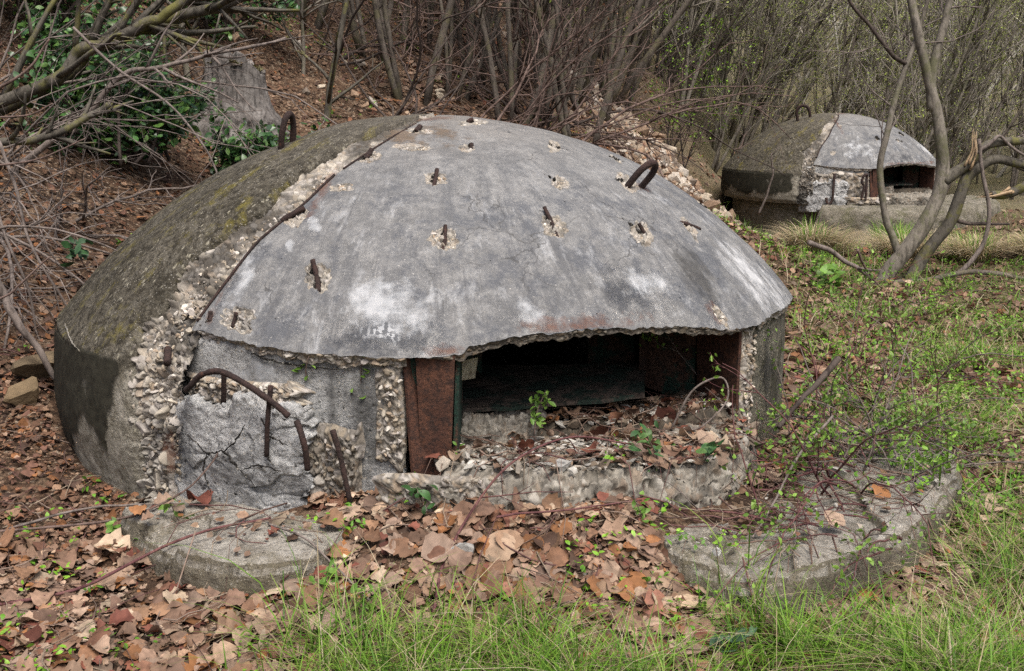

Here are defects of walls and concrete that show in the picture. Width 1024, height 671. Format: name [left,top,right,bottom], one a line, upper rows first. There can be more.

spalling [796,111,892,206]
spalling [128,112,544,515]
crack [187,418,288,493]